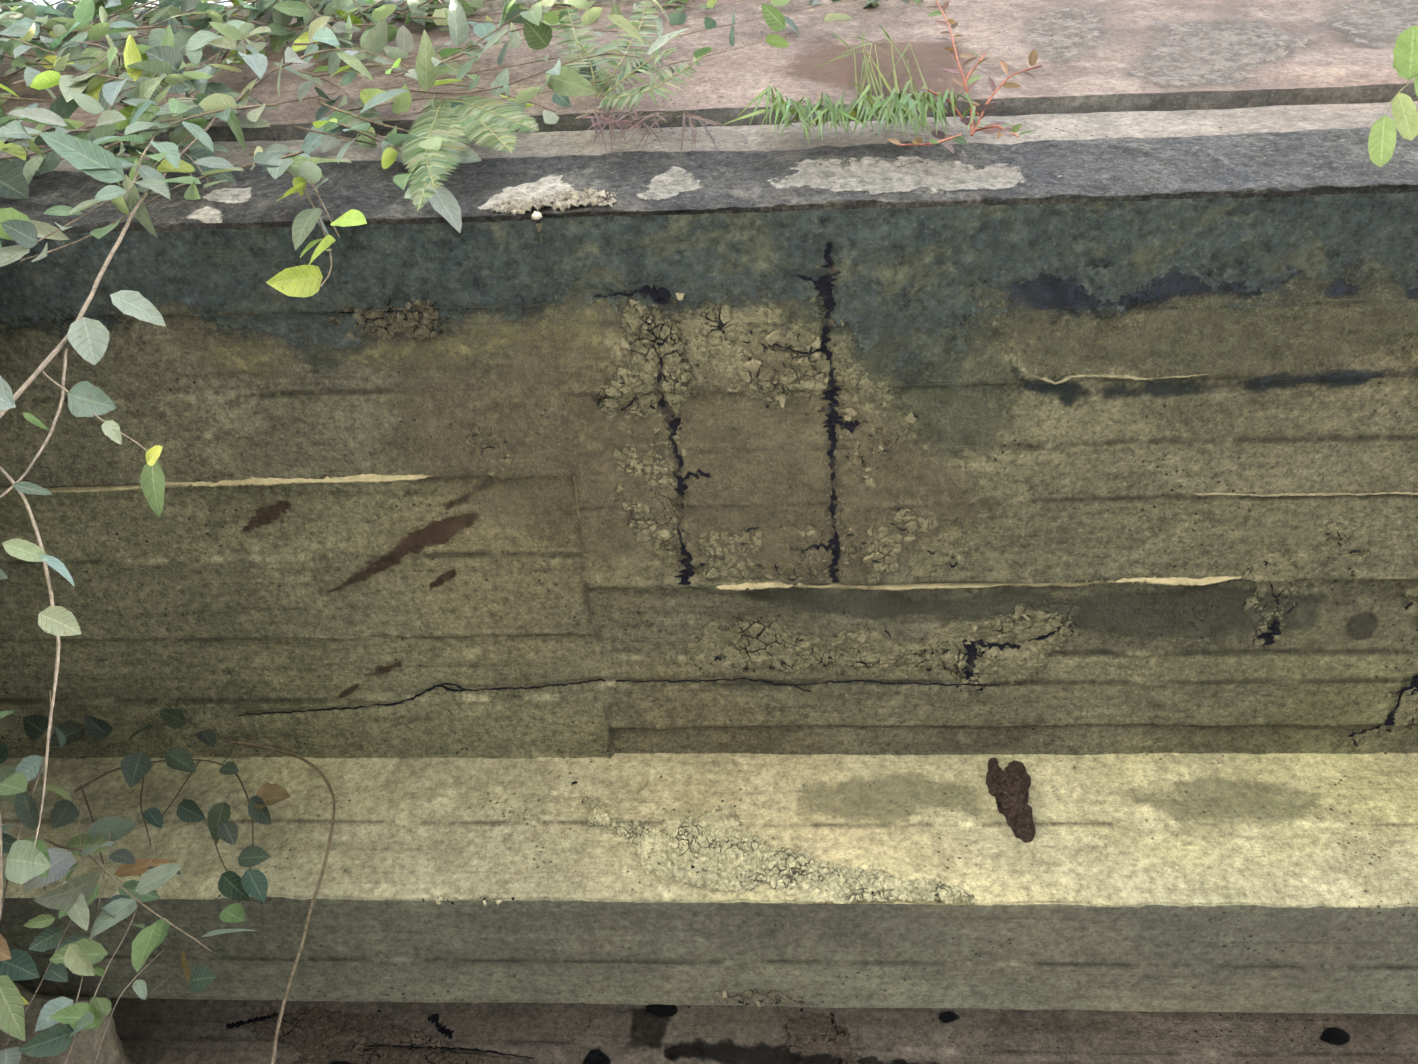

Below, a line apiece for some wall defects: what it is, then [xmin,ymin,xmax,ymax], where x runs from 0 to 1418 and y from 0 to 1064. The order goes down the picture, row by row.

damp [1008,264,1418,323]
damp [184,341,290,371]
crack [595,283,711,586]
crack [774,242,868,583]
damp [324,294,1319,636]
damp [1013,346,1418,406]
rust [328,482,488,592]
crack [238,632,1055,716]
crack [1348,674,1418,754]
damp [582,1049,611,1064]
damp [631,1004,939,1064]
damp [939,1011,959,1023]